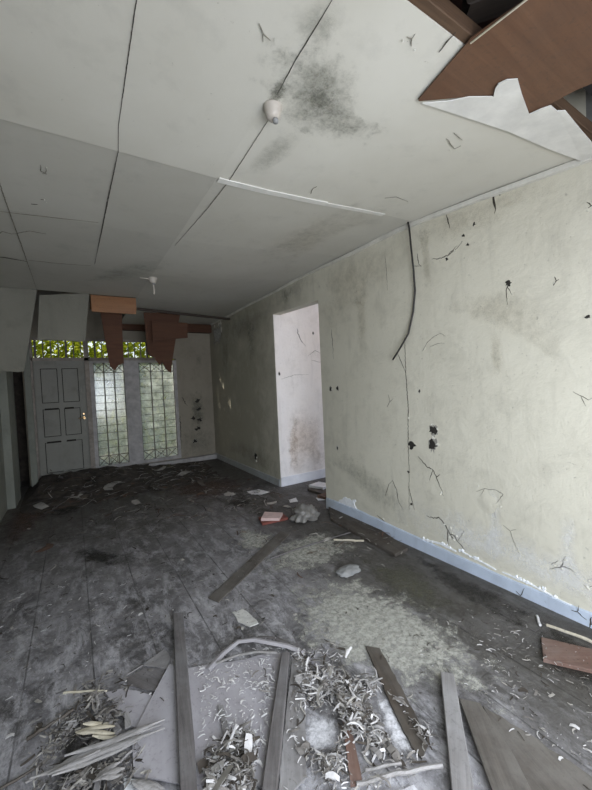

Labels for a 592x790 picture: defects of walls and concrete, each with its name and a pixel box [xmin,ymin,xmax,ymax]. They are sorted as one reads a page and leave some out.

crack [417,215,475,266]
crack [386,357,464,548]
crack [552,556,592,589]